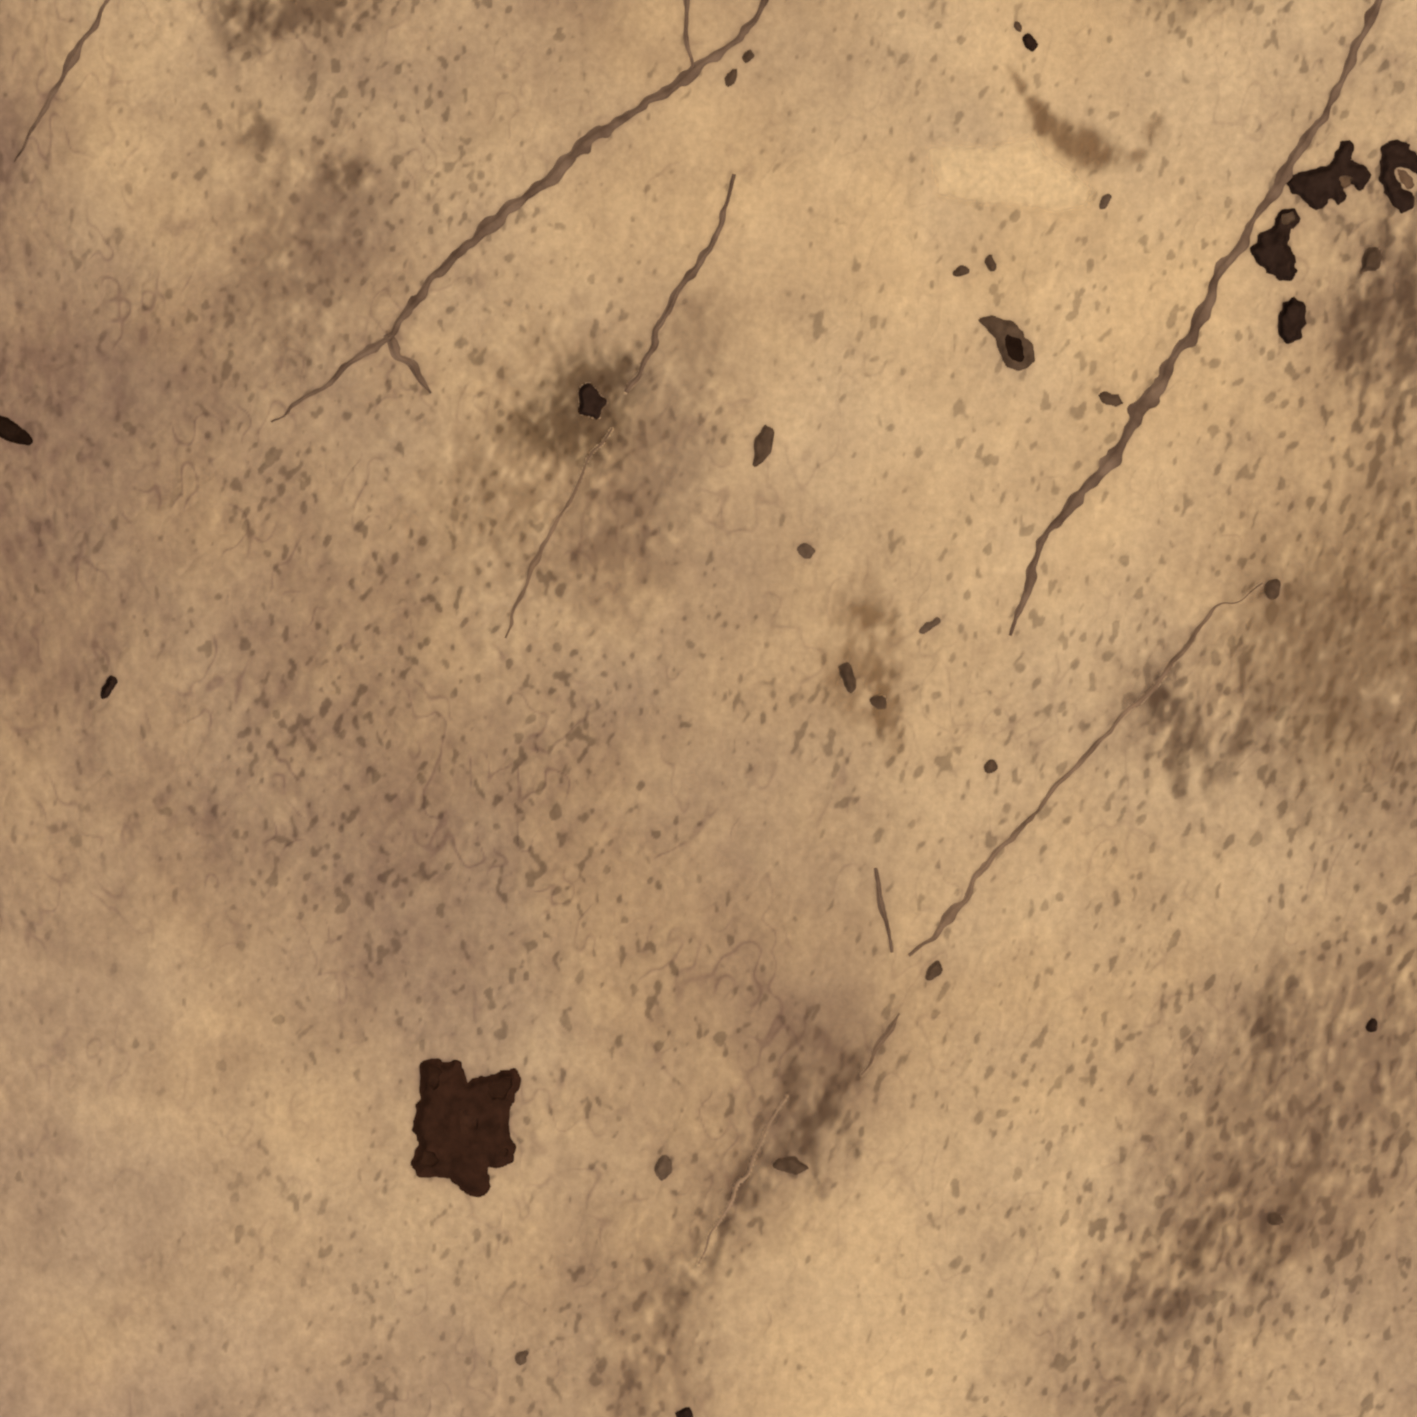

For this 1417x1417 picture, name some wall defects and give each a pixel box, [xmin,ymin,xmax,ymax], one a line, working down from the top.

crack [271,0,769,422]
peeling [978,315,1035,371]
crack [1009,0,1382,636]
spalling [1250,139,1417,344]
crack [505,428,613,638]
crack [874,583,1263,957]
spalling [411,1058,521,1197]
crack [698,1091,790,1264]
crack [860,1013,900,1076]